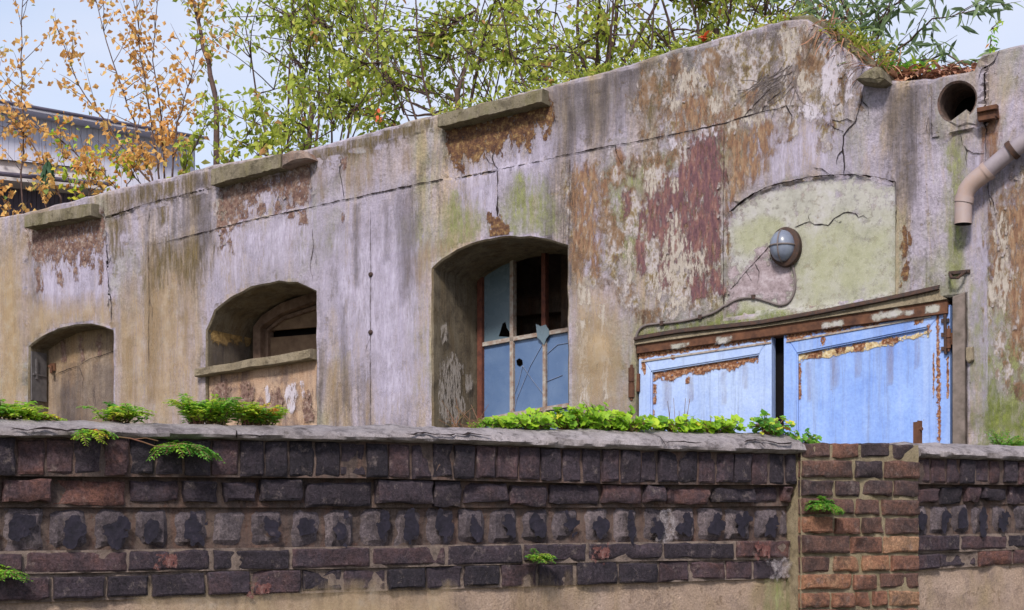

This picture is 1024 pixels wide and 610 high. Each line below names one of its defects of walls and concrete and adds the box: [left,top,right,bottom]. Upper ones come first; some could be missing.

peeling [24,209,108,293]
peeling [214,164,314,254]
crack [105,88,800,425]
spalling [438,94,558,175]
peeling [561,15,887,327]
crack [722,88,897,313]
crack [926,50,1000,216]
peeling [872,309,913,321]
flaking render [210,380,315,422]
flaking render [438,323,473,426]
corrosion [637,337,771,416]
corrosion [785,315,949,443]